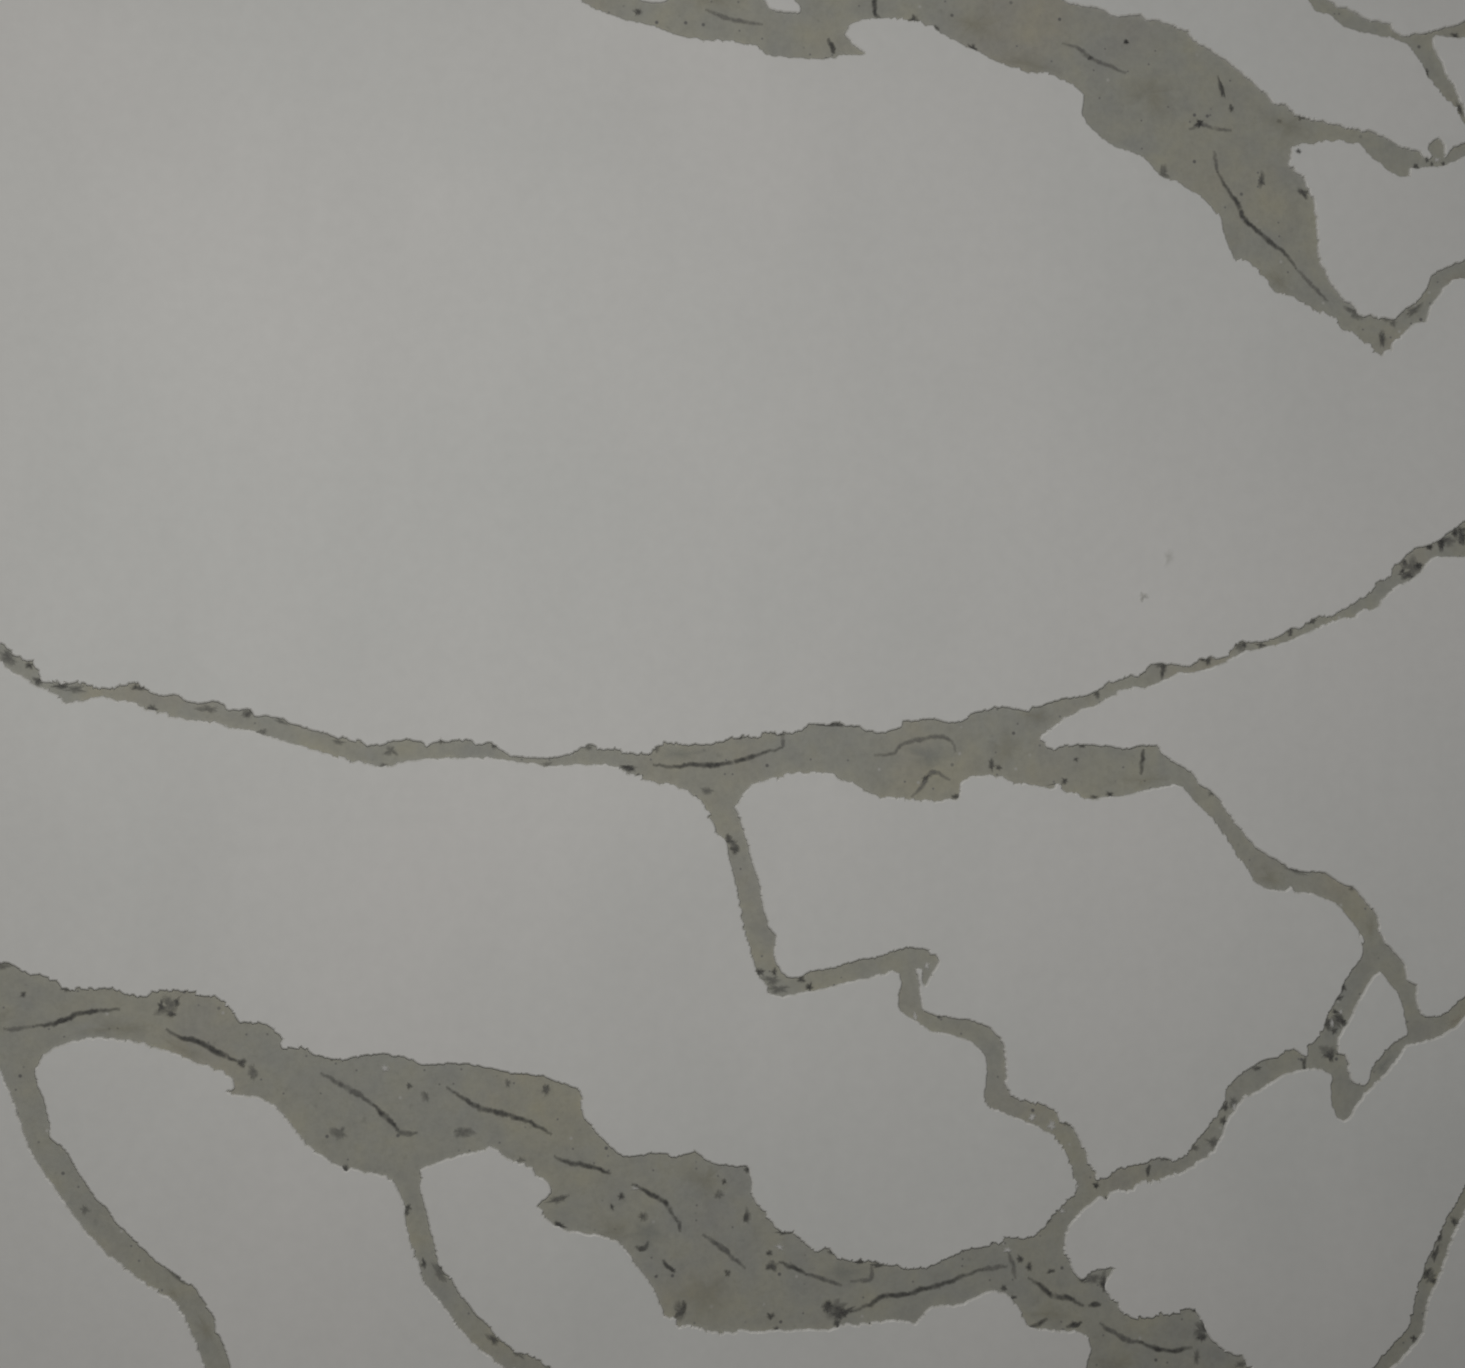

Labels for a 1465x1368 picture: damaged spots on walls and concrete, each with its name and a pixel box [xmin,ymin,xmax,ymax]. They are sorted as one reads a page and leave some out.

spalling [583,0,1465,355]
spalling [623,706,1193,809]
spalling [0,963,1251,1368]